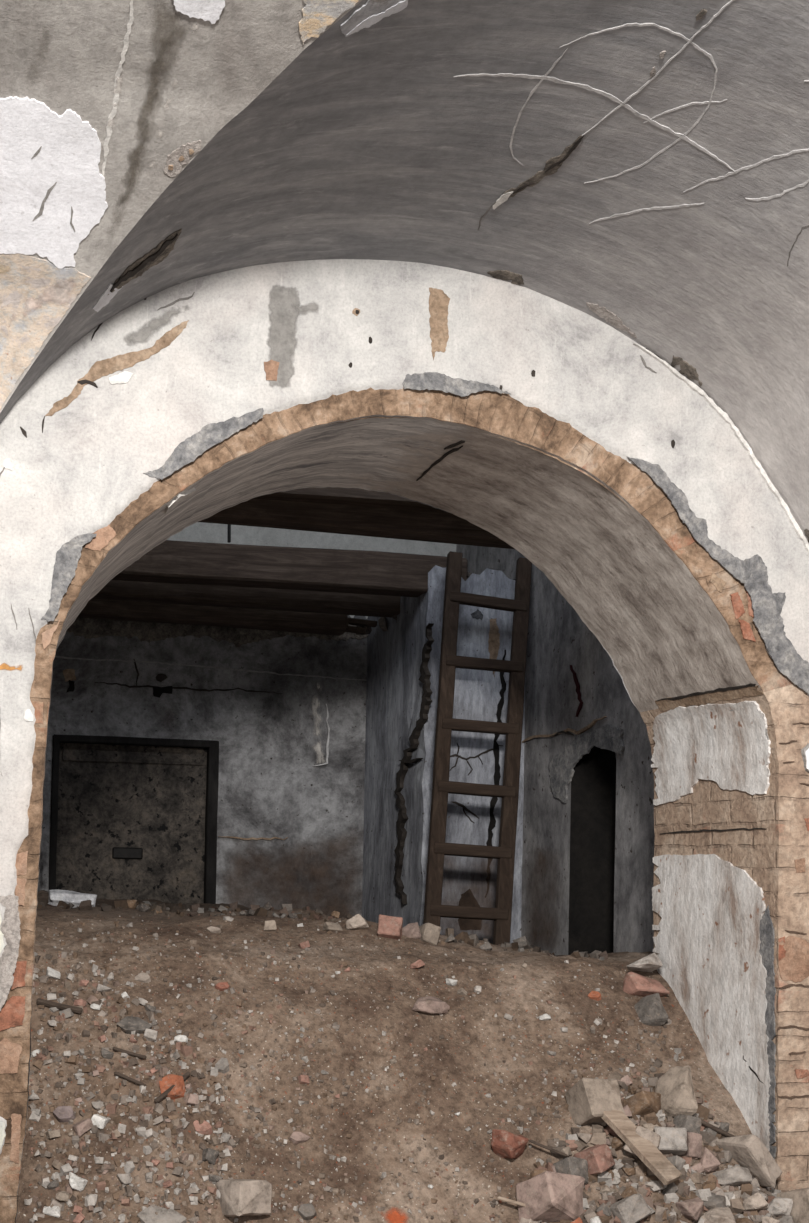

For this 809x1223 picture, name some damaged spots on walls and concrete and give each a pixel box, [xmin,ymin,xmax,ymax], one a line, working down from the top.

peeling [174,0,225,24]
peeling [299,0,408,44]
crack [478,0,734,230]
peeling [0,96,108,410]
crack [787,225,809,266]
crack [416,440,465,481]
crack [95,659,282,698]
crack [655,683,764,711]
spalling [0,286,809,1223]
crack [394,623,607,904]
crack [660,827,766,835]